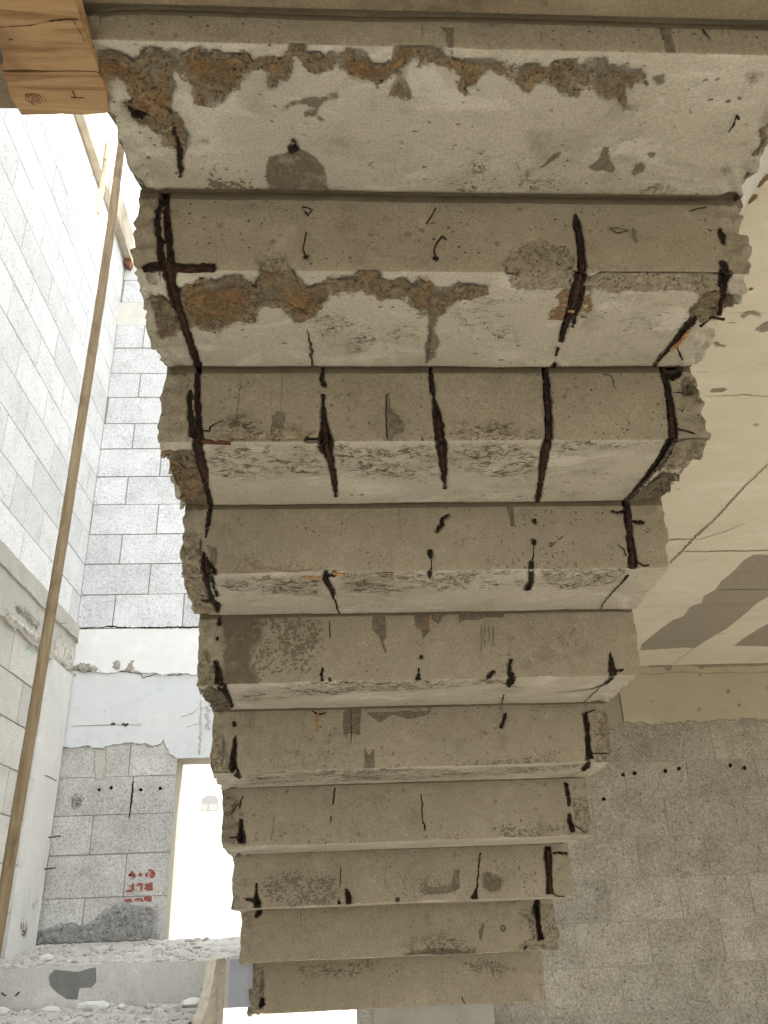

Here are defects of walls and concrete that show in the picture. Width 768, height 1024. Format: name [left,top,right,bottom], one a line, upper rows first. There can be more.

spalling [97,44,664,149]
leakage [266,144,329,191]
spalling [146,270,509,351]
spalling [501,240,742,326]
spalling [678,376,702,405]
spalling [161,446,322,506]
spalling [630,439,707,501]